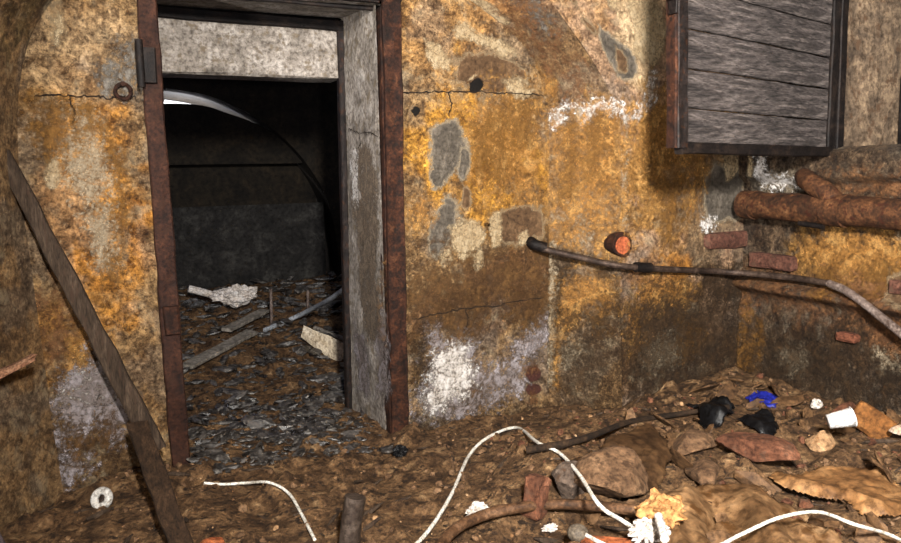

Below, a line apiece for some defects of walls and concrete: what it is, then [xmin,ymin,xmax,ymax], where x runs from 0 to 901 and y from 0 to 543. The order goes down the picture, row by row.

crack [35,94,136,122]
spalling [404,118,546,270]
water stain [406,67,901,431]
spalling [700,155,798,271]
spalling [884,272,901,308]